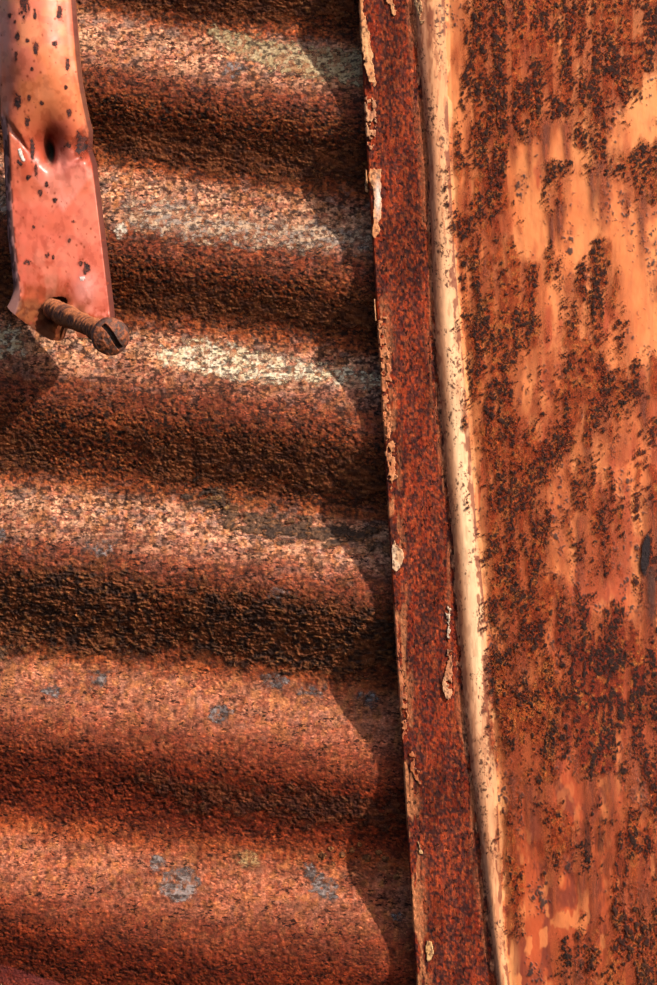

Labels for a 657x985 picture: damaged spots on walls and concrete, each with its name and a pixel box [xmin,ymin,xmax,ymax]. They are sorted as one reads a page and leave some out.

peeling [359,0,377,150]
peeling [365,168,382,238]
rust [173,474,384,551]
rust [441,0,657,985]